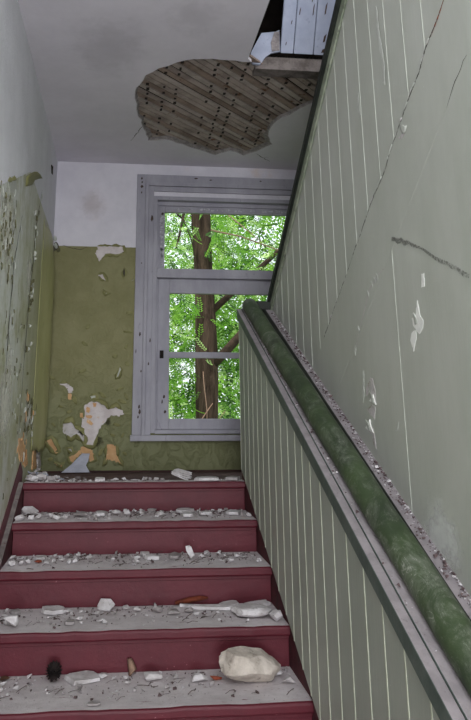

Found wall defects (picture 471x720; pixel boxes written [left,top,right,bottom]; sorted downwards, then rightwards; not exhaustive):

spalling [135,54,317,156]
peeling [0,175,17,284]
peeling [26,172,42,186]
peeling [95,244,126,261]
crack [324,0,444,337]
peeling [410,301,423,352]
peeling [0,310,124,471]
peeling [362,371,376,447]